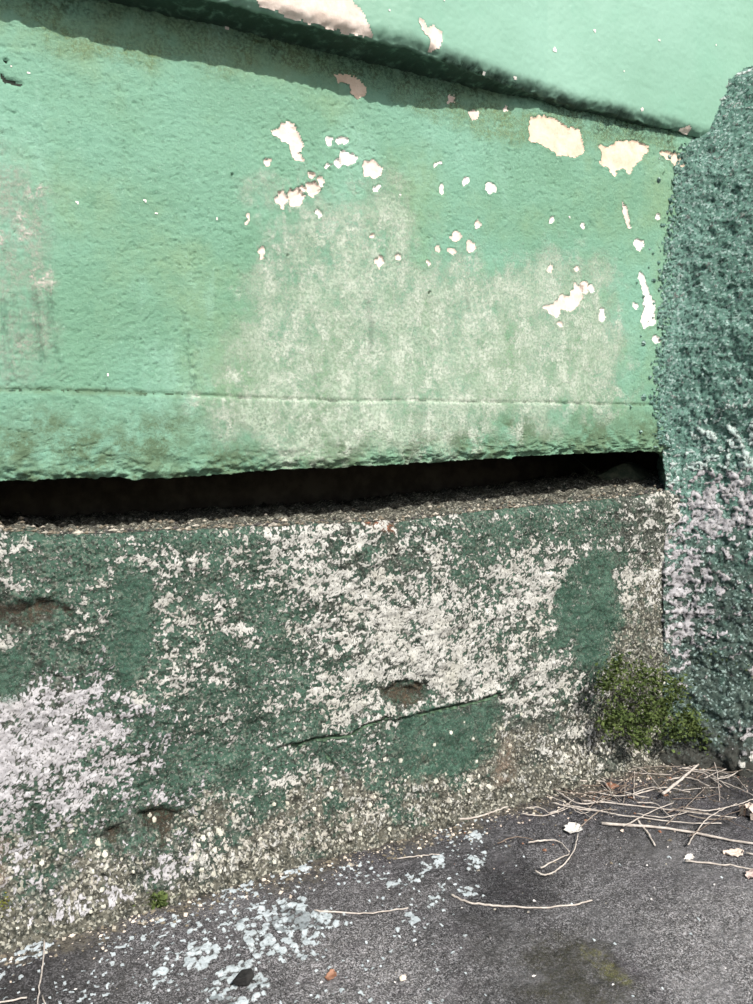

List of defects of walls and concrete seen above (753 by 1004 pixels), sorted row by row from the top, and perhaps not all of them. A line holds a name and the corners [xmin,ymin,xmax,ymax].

peeling [257,0,373,38]
peeling [271,121,383,218]
peeling [528,115,585,158]
peeling [598,140,685,177]
peeling [543,266,595,327]
peeling [633,272,661,344]
crack [417,694,499,717]
crack [291,716,388,761]
damp [526,725,661,792]
damp [155,737,536,892]
damp [0,847,51,898]
damp [59,844,139,914]